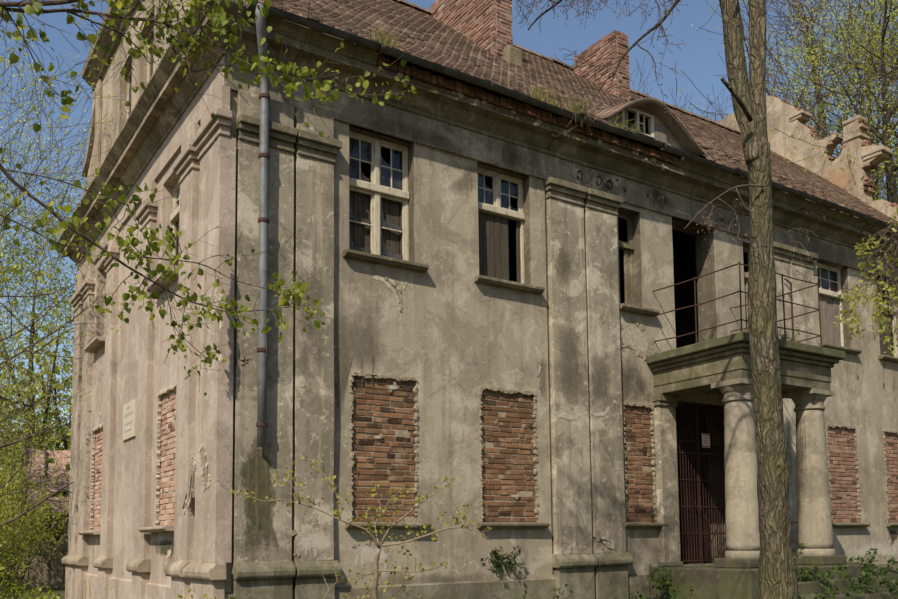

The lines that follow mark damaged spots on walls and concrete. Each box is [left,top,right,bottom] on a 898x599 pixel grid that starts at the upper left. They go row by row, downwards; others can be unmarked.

peeling [374,275,407,315]
leakage [241,440,277,547]